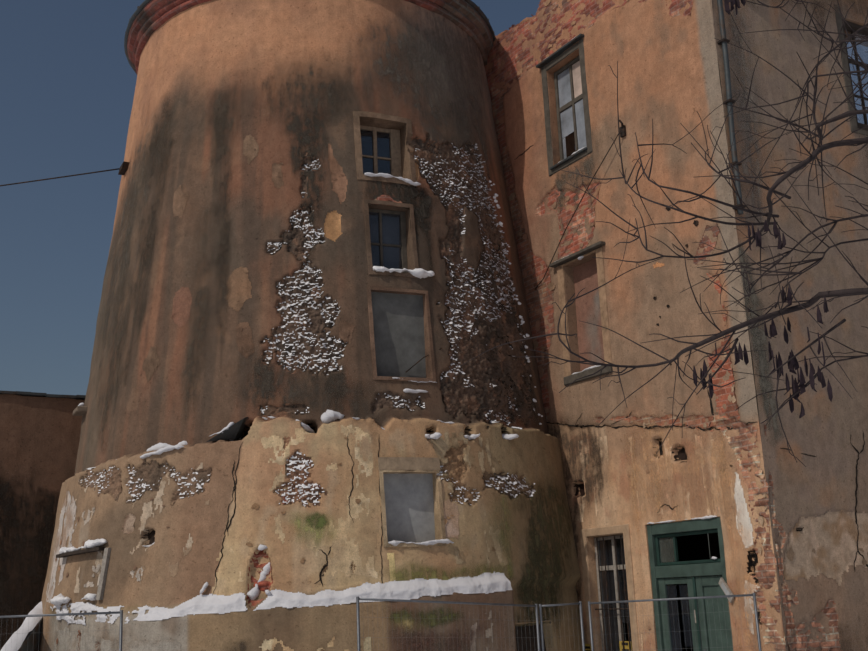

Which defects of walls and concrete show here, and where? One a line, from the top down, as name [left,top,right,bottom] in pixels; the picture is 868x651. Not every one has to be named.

spalling [260,144,348,376]
damp [366,181,433,263]
spalling [406,0,646,506]
spalling [46,459,213,603]
crack [212,442,243,596]
spalling [238,542,273,610]
spalling [260,404,327,544]
crack [315,547,331,586]
peeling [300,425,378,579]
peeling [574,436,609,522]
peeling [593,273,868,651]
crack [850,432,868,570]